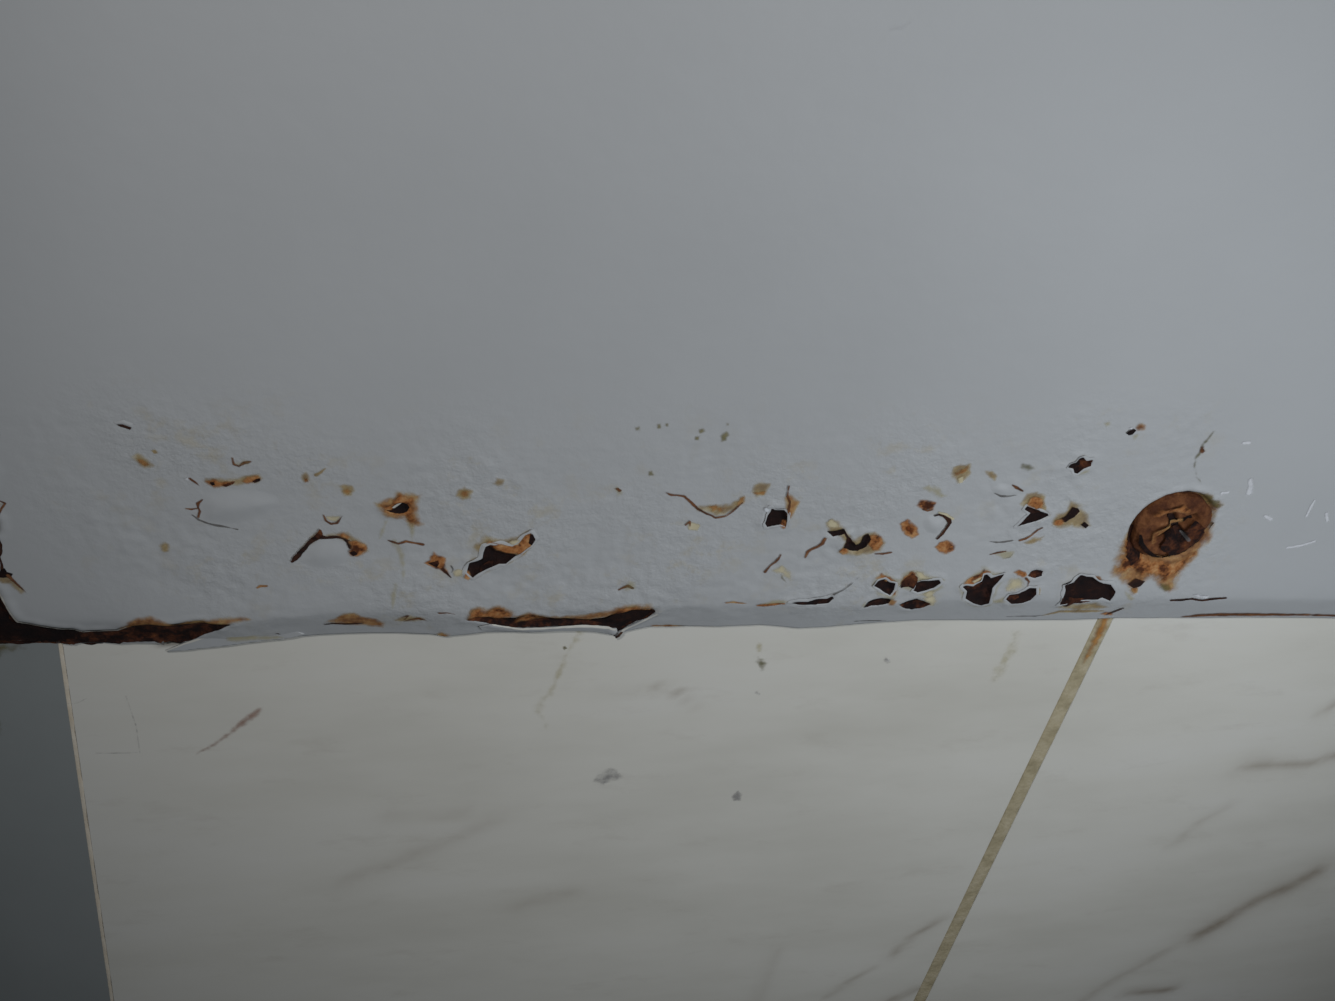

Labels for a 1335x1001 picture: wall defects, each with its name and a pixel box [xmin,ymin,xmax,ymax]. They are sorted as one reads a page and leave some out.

corrosion [378,493,420,525]
corrosion [388,540,462,578]
peeling [462,530,539,580]
peeling [763,505,791,530]
corrosion [805,520,892,558]
corrosion [901,520,919,538]
corrosion [918,500,936,512]
peeling [1012,485,1050,529]
corrosion [1113,491,1220,593]
peeling [873,577,944,597]
peeling [960,573,1039,607]
peeling [1056,573,1119,607]